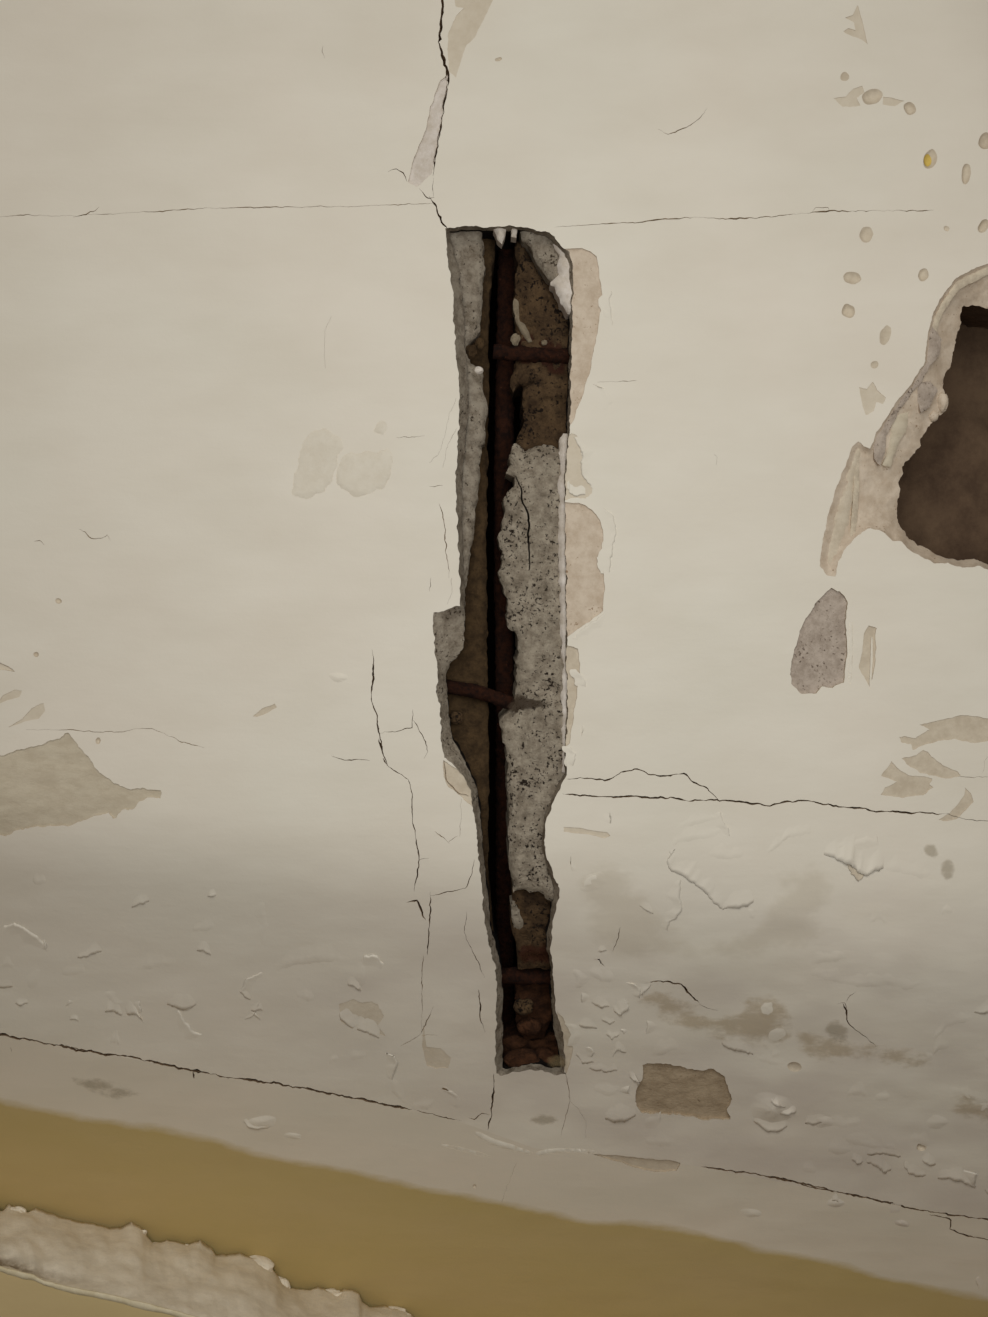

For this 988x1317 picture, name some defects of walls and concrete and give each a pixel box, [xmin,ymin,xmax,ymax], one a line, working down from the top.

crack [2,0,450,228]
spalling [790,264,988,694]
spalling [433,225,610,1076]
rust [509,695,544,715]
peeling [0,733,162,836]
crack [565,768,984,821]
crack [333,651,485,1046]
rust [520,945,549,962]
crack [0,1033,495,1129]
spalling [635,1063,732,1120]
crack [706,1167,988,1240]
spalling [0,1204,413,1317]